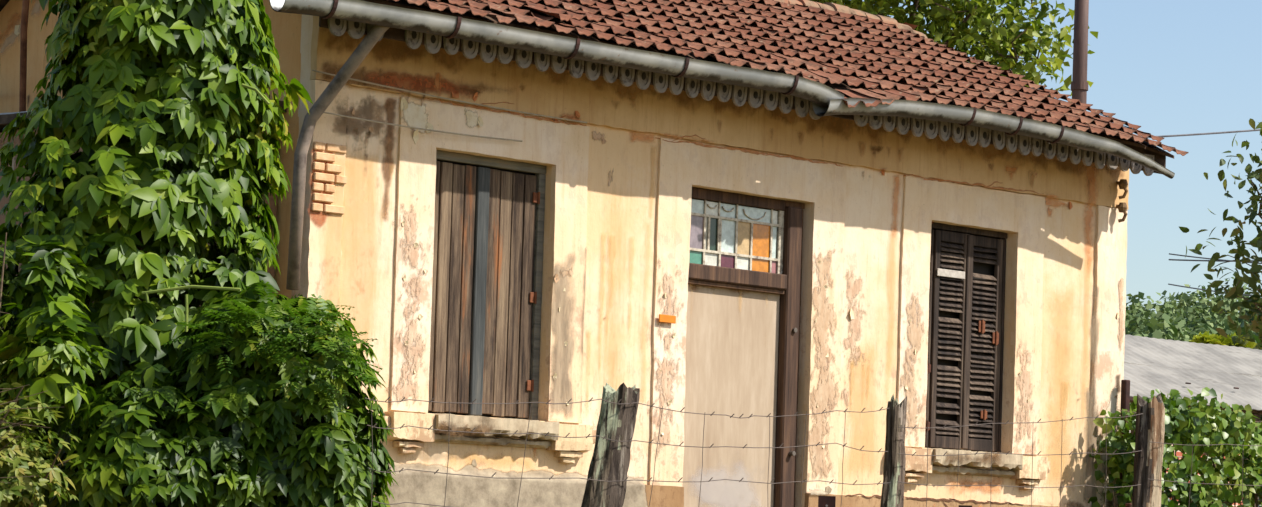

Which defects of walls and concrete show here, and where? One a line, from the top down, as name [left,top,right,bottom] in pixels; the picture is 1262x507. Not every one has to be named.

flaking render [310,141,347,226]
damp [323,31,482,219]
damp [546,67,912,154]
damp [929,135,1122,265]
peeling [552,256,575,415]
peeling [808,250,866,495]